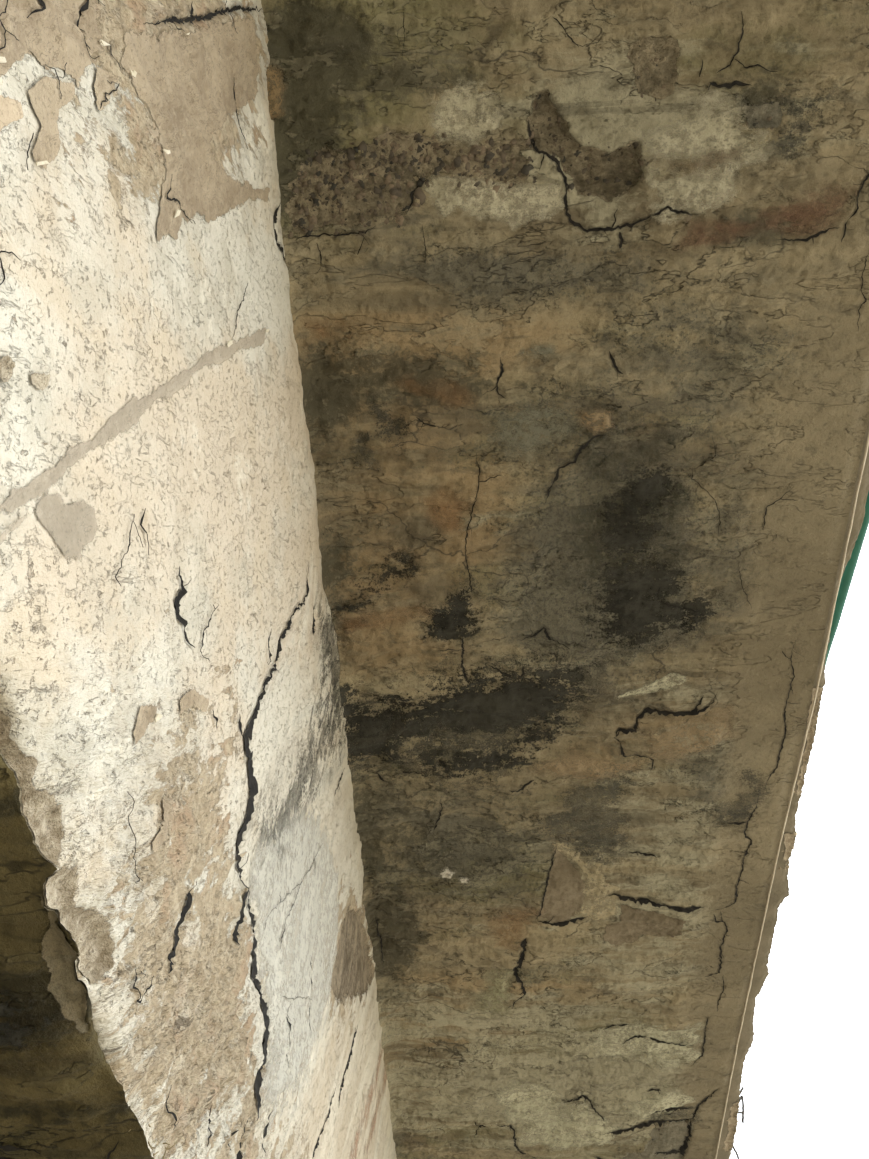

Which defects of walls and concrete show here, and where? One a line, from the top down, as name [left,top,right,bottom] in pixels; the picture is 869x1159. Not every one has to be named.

crack [145,0,262,31]
peeling [0,0,270,241]
spalling [284,89,646,238]
crack [528,120,693,248]
crack [174,566,219,661]
damp [261,552,639,864]
damp [586,466,717,649]
damp [618,673,686,698]
crack [207,568,323,1159]
crack [508,645,802,1063]
crack [564,1089,718,1159]
spalling [620,1119,694,1159]